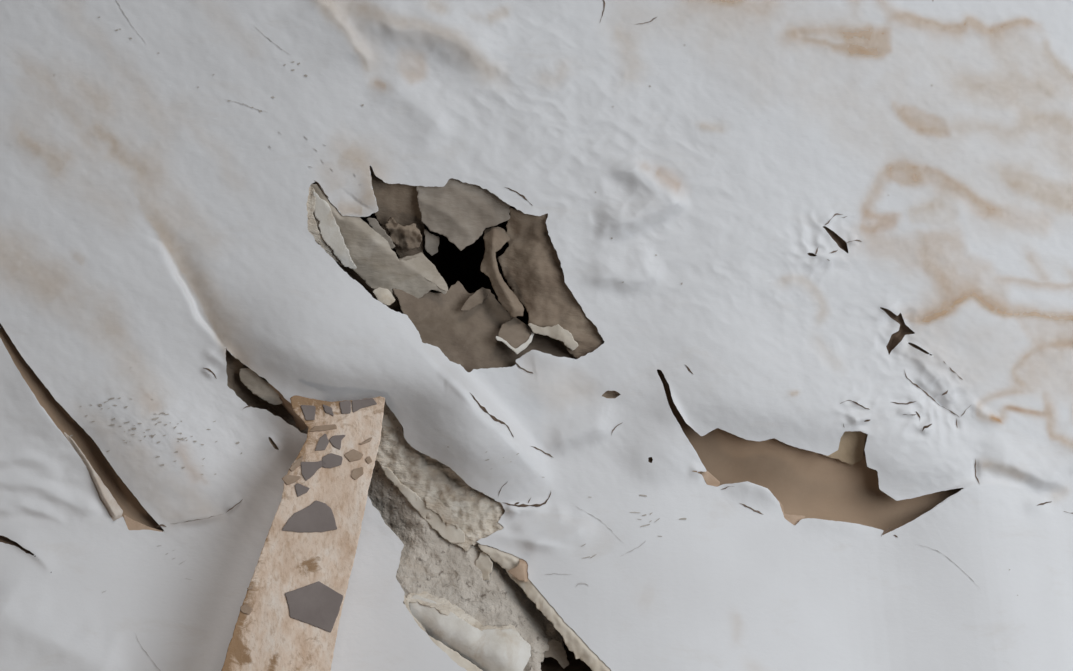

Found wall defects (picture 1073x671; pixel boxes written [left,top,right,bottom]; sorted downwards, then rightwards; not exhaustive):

peeling [80,398,217,469]
peeling [282,398,465,543]
peeling [285,581,343,632]
spalling [478,544,611,671]